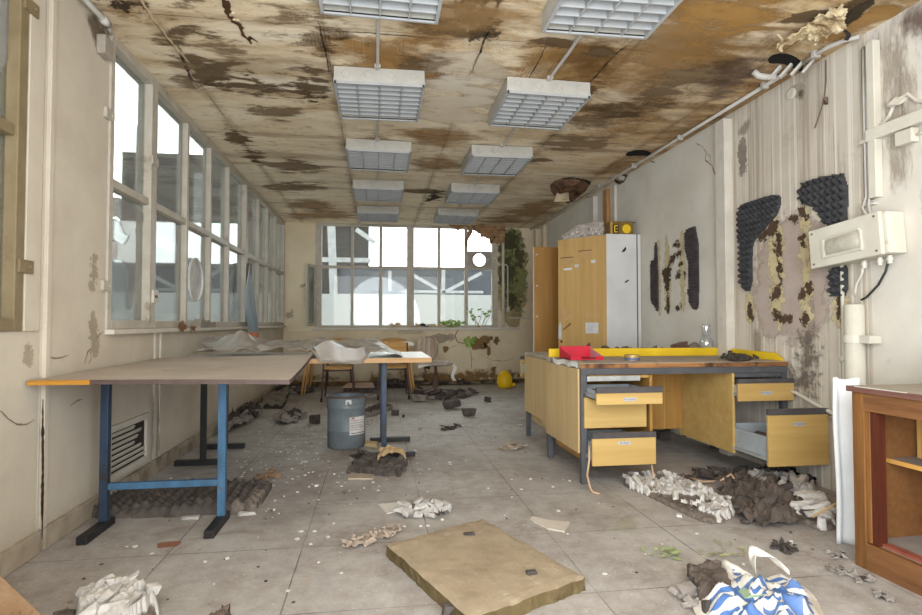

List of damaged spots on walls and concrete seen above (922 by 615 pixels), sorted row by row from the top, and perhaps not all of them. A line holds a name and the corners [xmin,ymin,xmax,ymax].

crack [222,0,257,44]
water stain [152,18,331,121]
water stain [264,0,521,78]
water stain [511,0,799,176]
water stain [820,5,922,43]
water stain [224,129,357,219]
peeling [89,253,98,291]
peeling [662,239,686,314]
peeling [756,220,814,327]
peeling [89,311,99,357]
flaking render [470,335,500,356]
crack [0,403,45,538]